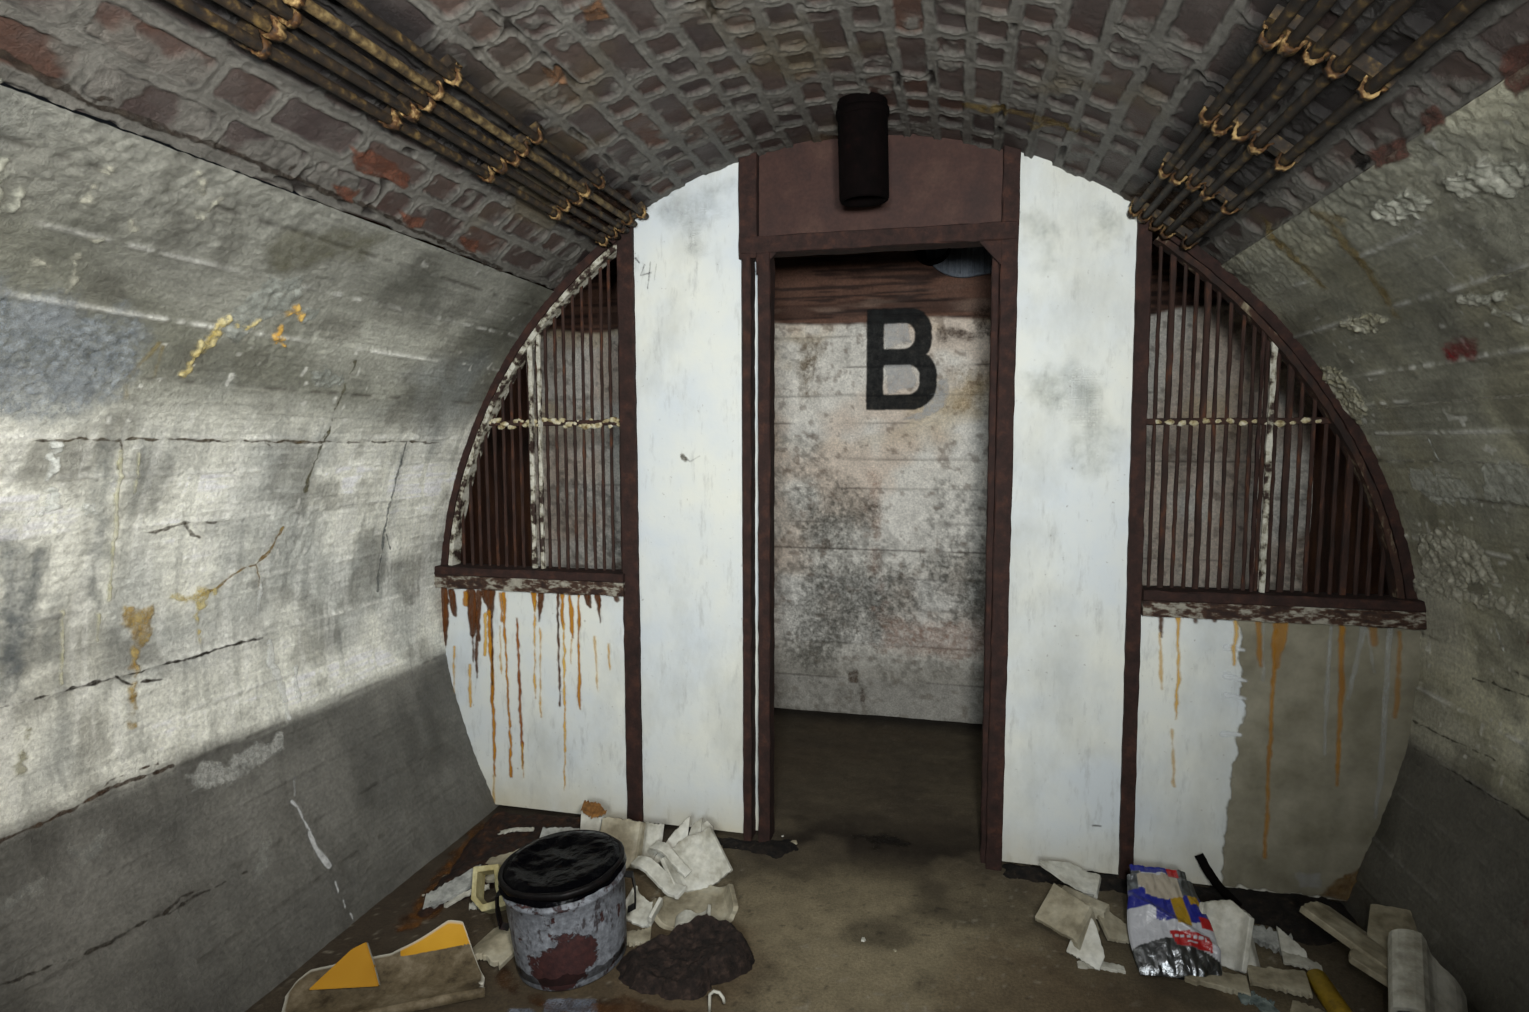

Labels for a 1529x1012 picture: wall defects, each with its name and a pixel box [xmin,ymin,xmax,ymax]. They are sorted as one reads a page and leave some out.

flaking render [1500,41,1529,97]
peeling [0,158,27,214]
flaking render [1351,137,1410,171]
flaking render [1421,105,1445,134]
crack [37,360,431,598]
water stain [799,556,907,661]
crack [34,638,263,700]
corrosion [441,587,619,781]
corrosion [1159,617,1238,713]
corrosion [1256,621,1287,858]
corrosion [1336,625,1345,774]